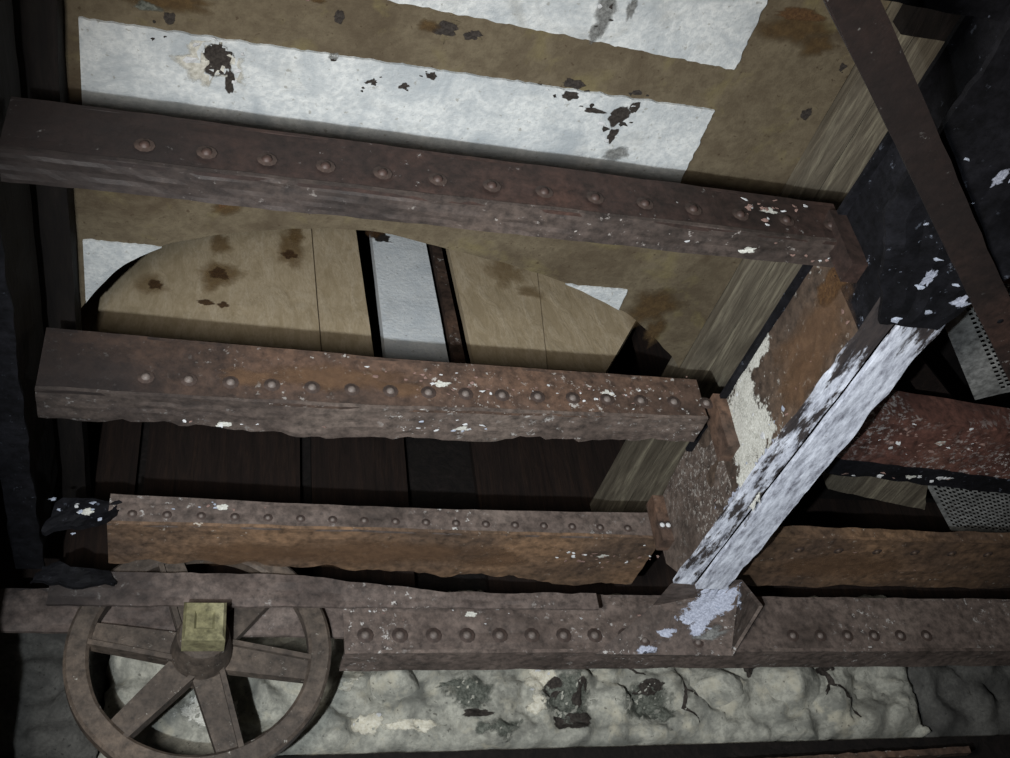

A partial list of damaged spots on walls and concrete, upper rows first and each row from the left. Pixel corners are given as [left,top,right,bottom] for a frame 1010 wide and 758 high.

peeling [589,0,637,43]
damp [759,8,832,55]
spalling [175,37,244,94]
peeling [537,78,649,160]
rust [579,384,648,410]
rust [856,423,990,459]
rust [877,472,953,483]